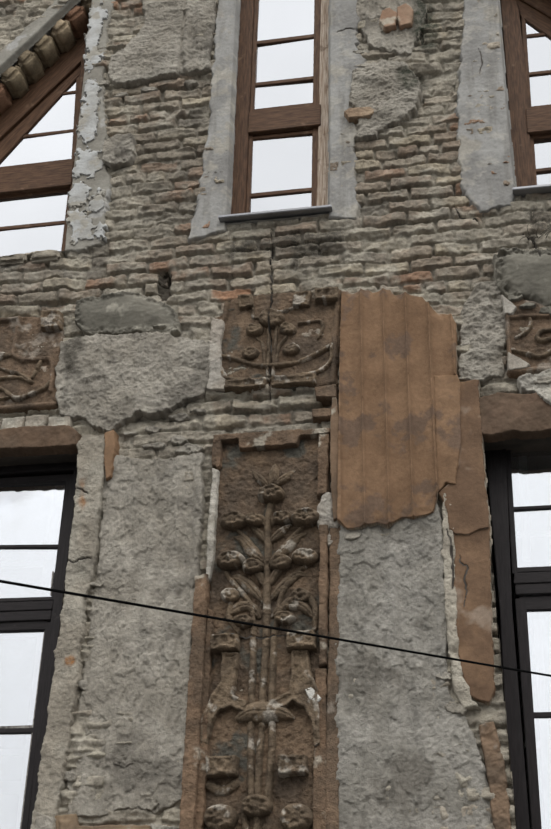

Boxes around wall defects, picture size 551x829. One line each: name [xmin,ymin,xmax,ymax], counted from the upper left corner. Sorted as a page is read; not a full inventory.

peeling [65,0,110,246]
crack [266,230,274,401]
spalling [458,280,551,405]